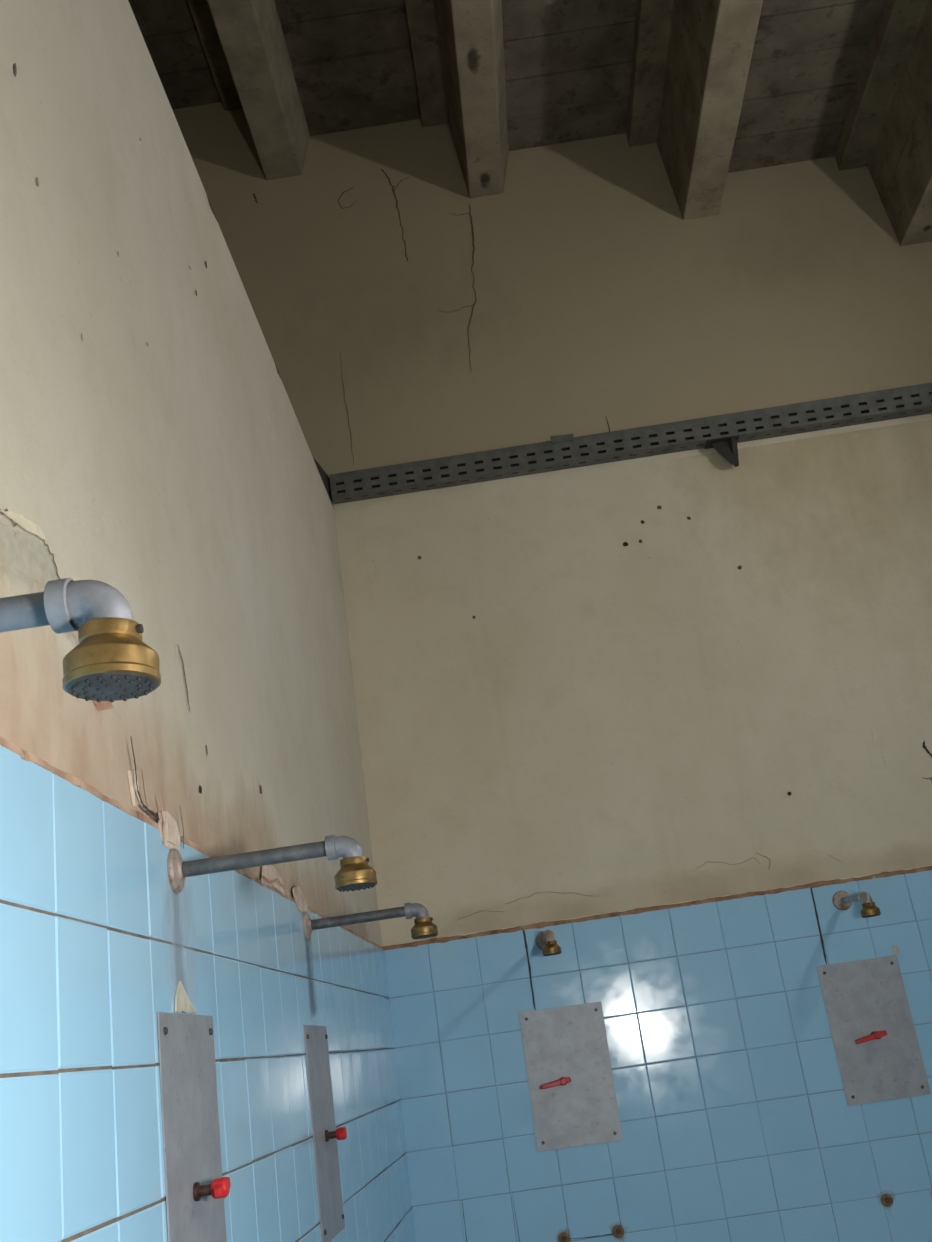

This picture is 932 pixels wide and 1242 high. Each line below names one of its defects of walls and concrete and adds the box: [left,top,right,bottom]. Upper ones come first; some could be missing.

crack [381,169,408,261]
crack [443,205,477,367]
spalling [0,508,60,586]